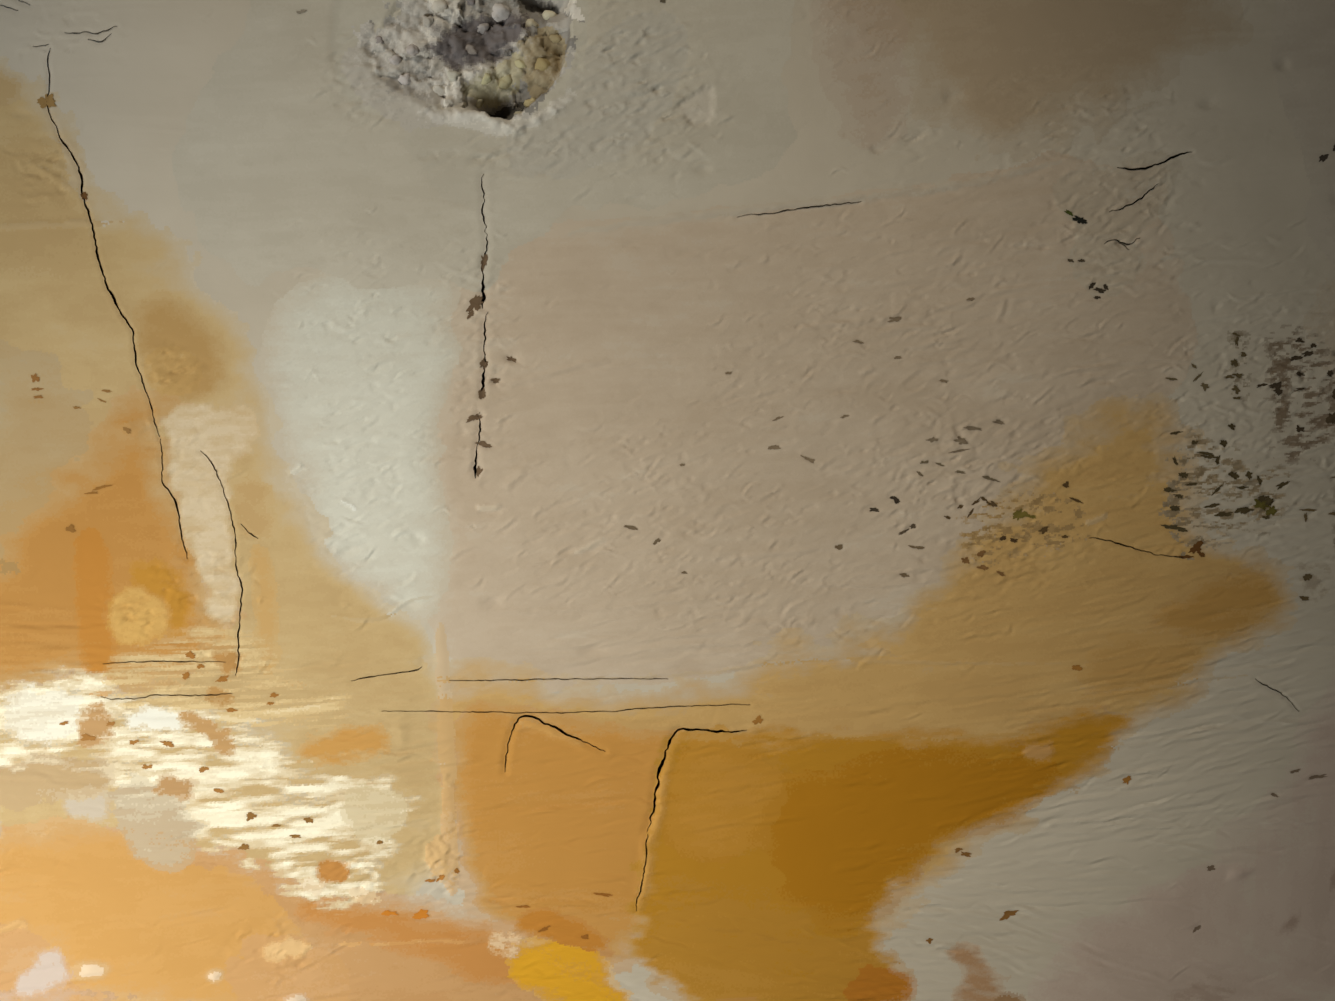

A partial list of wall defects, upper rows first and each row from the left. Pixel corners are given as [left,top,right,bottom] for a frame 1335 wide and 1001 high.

damp [419,8,533,74]
hole [487,102,526,120]
hole [508,0,555,16]
damp [809,0,1254,162]
damp [1270,0,1335,265]
crack [33,26,188,559]
crack [466,174,516,476]
crack [103,453,258,700]
damp [0,56,443,896]
damp [449,278,1335,974]
crack [353,668,747,909]